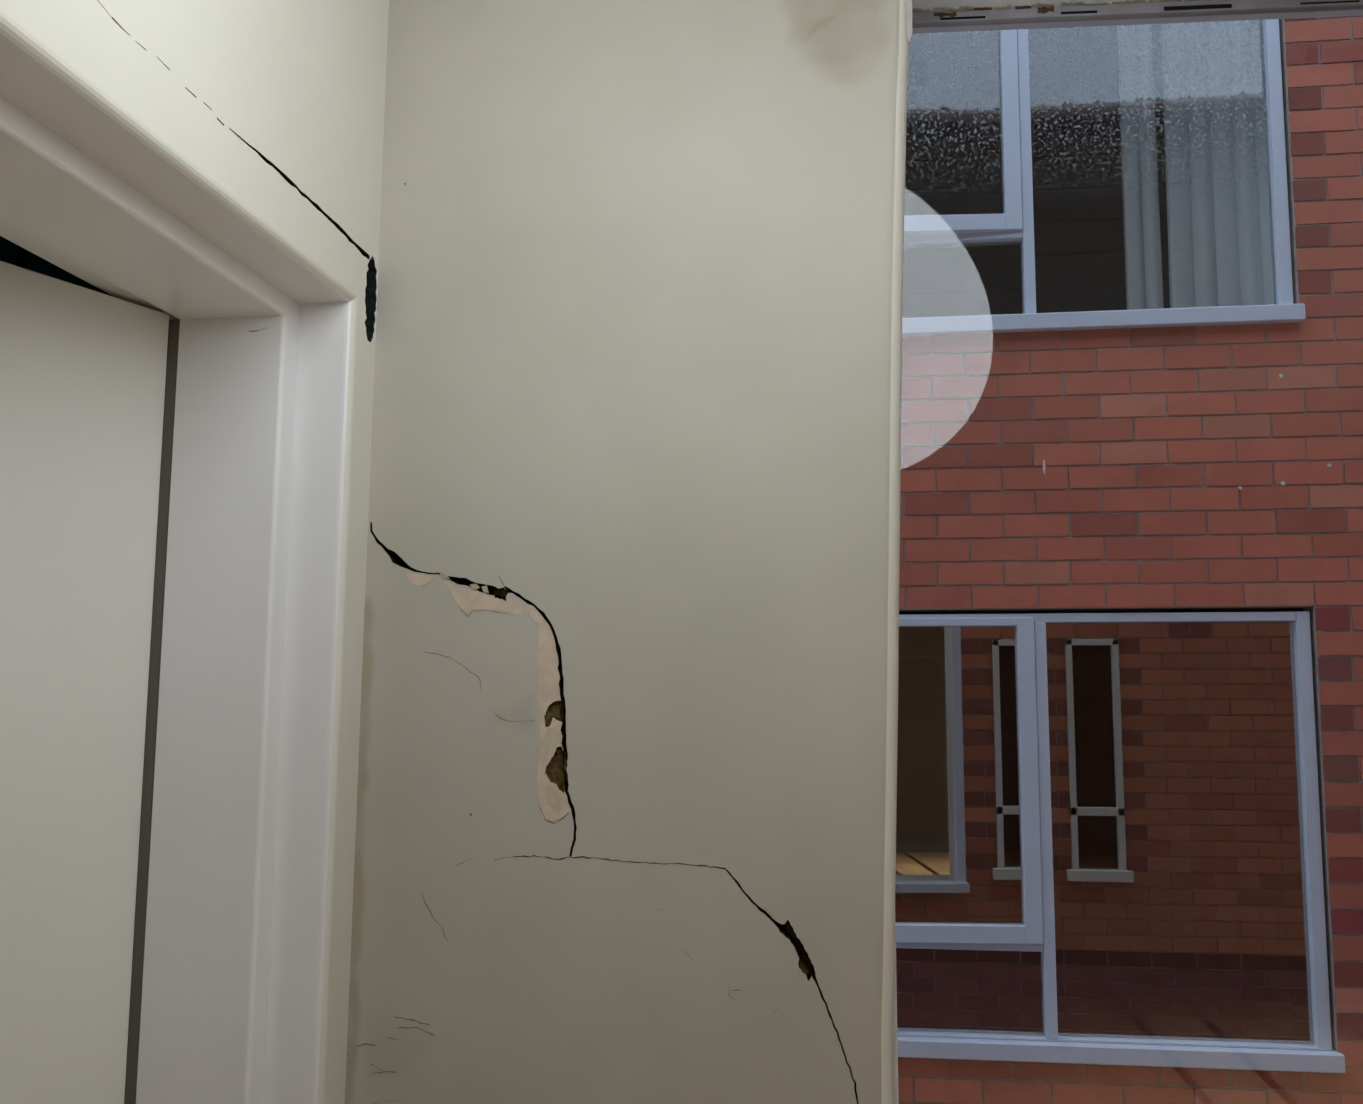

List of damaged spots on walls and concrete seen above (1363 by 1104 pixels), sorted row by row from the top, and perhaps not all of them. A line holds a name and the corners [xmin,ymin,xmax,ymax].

crack [97,0,377,342]
crack [370,522,859,1104]
crack [347,1017,457,1104]